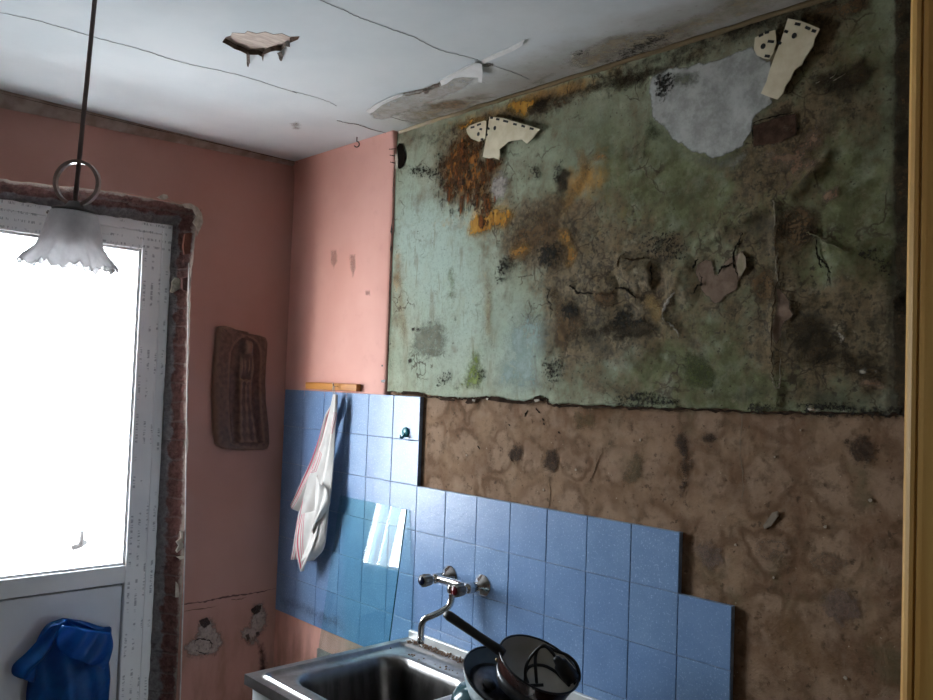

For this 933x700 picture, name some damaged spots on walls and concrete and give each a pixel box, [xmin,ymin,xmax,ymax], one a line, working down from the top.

crack [0,12,405,133]
crack [320,0,528,79]
peeling [366,40,524,119]
flaking render [647,47,797,165]
water stain [469,209,512,235]
water stain [495,160,573,284]
crack [569,255,653,307]
crack [806,232,845,287]
water stain [791,0,911,413]
water stain [408,322,446,363]
spalling [0,159,211,700]
peeling [401,391,905,425]